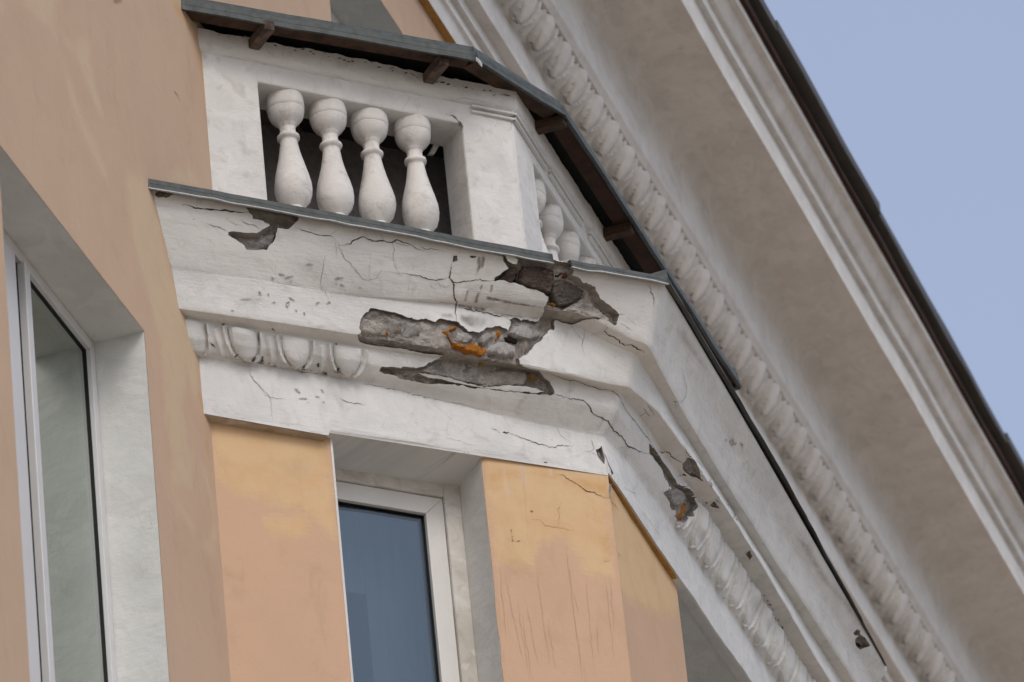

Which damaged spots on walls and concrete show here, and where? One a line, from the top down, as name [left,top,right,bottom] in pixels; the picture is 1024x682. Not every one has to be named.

crack [184,204,257,231]
spalling [228,207,299,250]
crack [303,230,501,321]
spalling [358,255,619,395]
crack [574,285,655,353]
crack [492,370,701,465]
spalling [596,446,613,497]
crack [560,474,660,536]
spalling [649,444,737,523]
spalling [854,629,870,649]